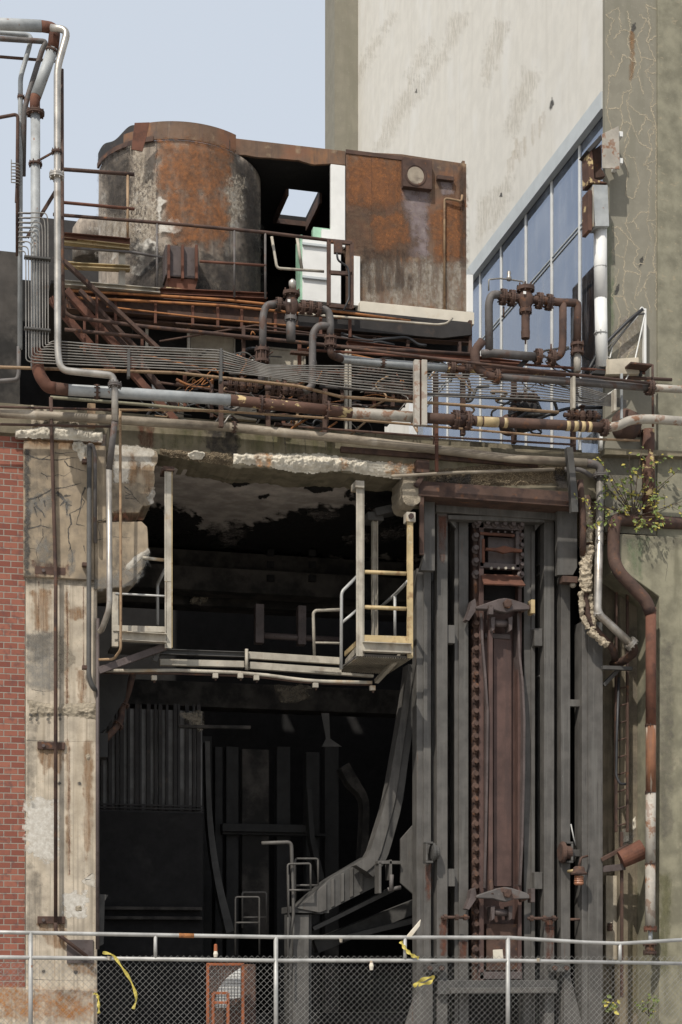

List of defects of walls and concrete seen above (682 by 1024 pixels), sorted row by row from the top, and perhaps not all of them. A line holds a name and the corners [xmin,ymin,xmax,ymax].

corrosion [362,214,411,293]
corrosion [430,169,466,260]
crack [606,4,657,359]
crack [27,452,105,561]
spalling [113,445,414,483]
spalling [125,548,150,570]